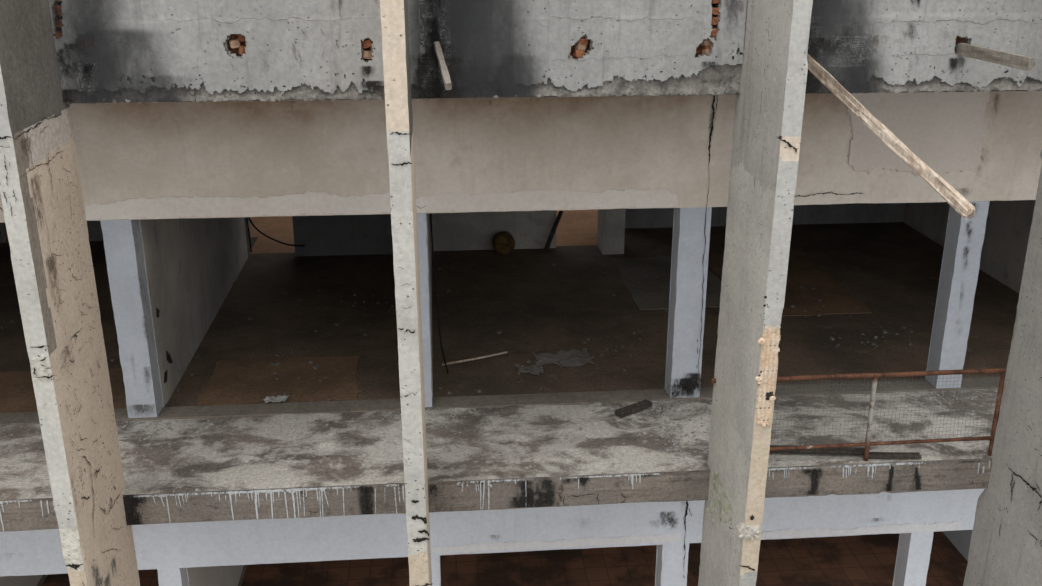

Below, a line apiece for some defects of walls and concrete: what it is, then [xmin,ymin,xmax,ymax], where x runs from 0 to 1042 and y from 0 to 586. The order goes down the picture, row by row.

spalling [54,0,67,49]
damp [53,0,160,103]
spalling [493,0,742,98]
spalling [411,80,453,99]
crack [708,95,718,165]
crack [776,135,797,154]
spalling [755,326,781,427]
damp [123,484,405,525]
damp [458,473,659,510]
crack [664,471,708,579]
damp [768,462,929,495]
crack [999,464,1042,547]